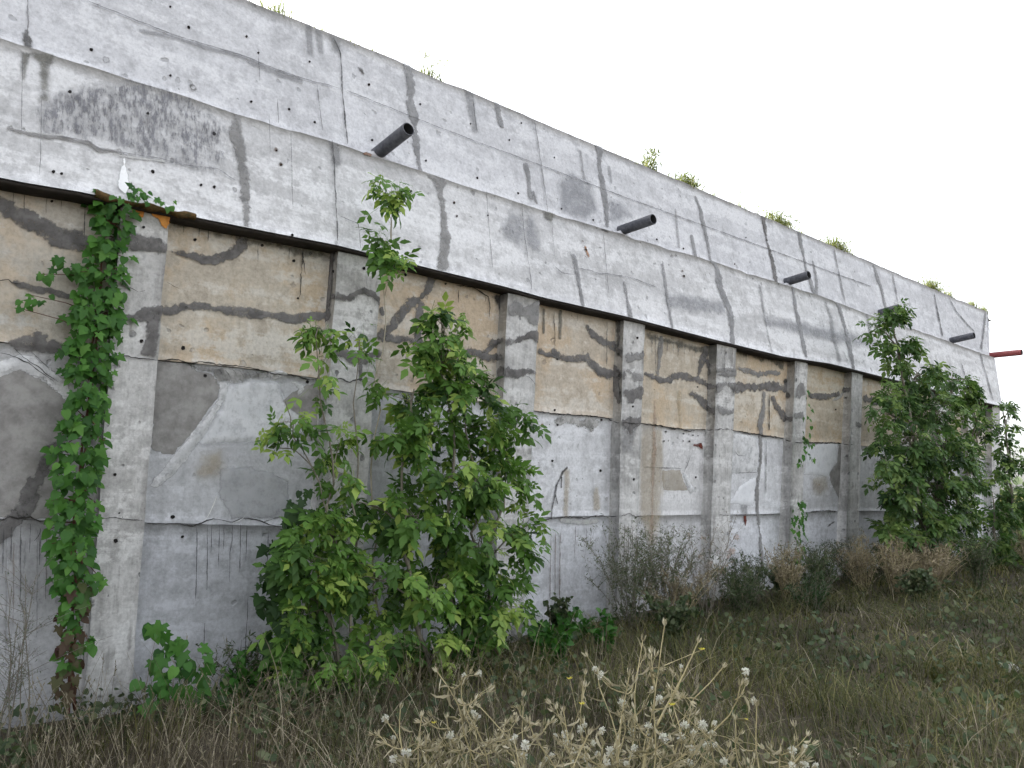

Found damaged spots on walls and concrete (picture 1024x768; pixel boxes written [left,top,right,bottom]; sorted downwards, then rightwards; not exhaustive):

leakage [22,53,222,166]
rust [132,209,170,229]
crack [89,1,898,575]
peeling [0,349,70,400]
leakage [195,524,247,597]